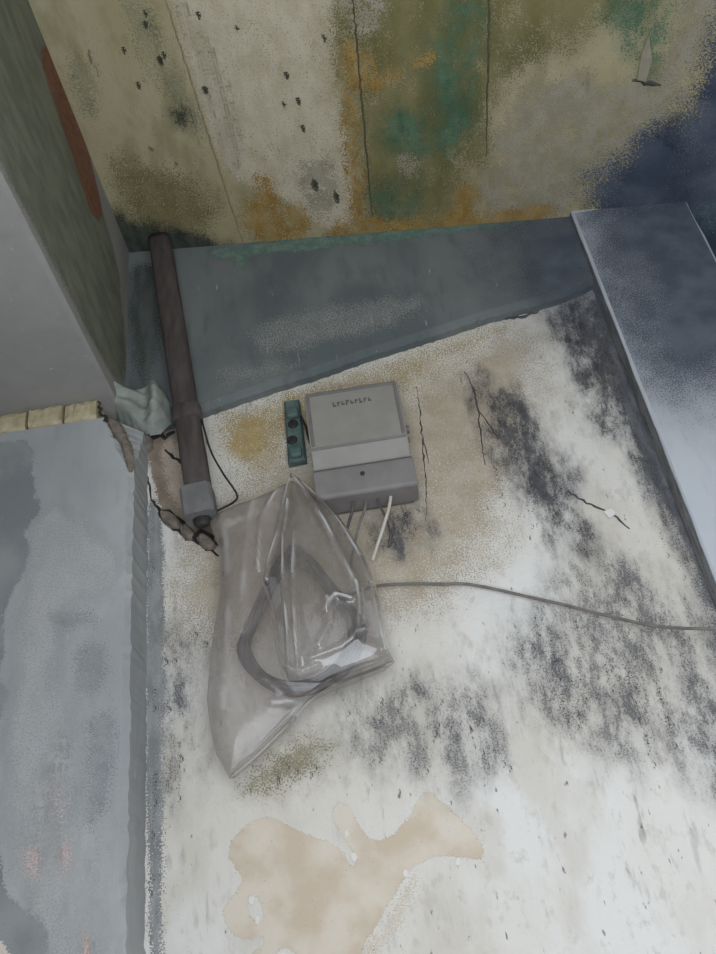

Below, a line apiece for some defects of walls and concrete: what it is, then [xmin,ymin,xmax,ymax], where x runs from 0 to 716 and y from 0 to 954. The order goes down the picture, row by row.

rust [232,29,570,242]
leakage [112,209,232,388]
leakage [145,0,716,954]
peeling [222,792,484,954]